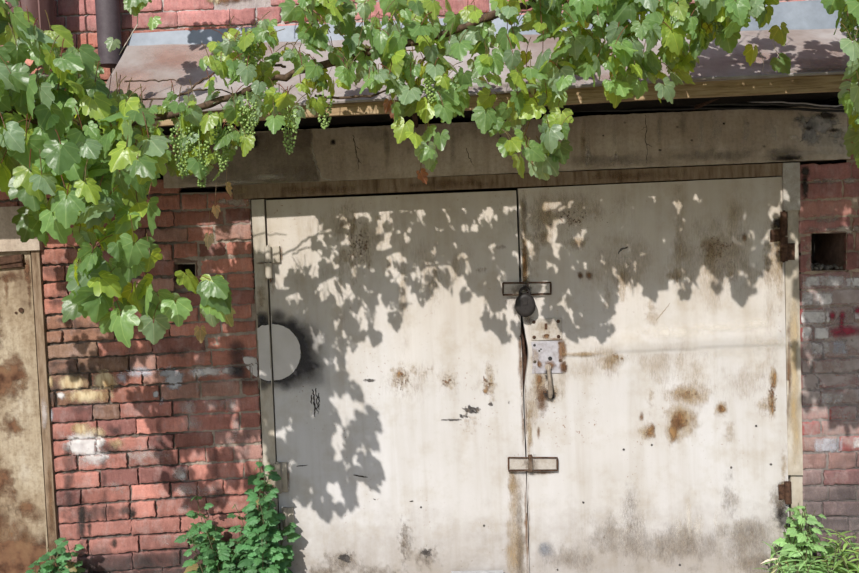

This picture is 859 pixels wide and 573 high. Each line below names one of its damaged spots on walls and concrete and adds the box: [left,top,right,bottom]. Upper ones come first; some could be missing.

leakage [48,373,115,401]
leakage [192,367,233,376]
corrosion [522,328,566,445]
corrosion [668,388,703,440]
leakage [67,424,120,464]
corrosion [508,504,528,568]